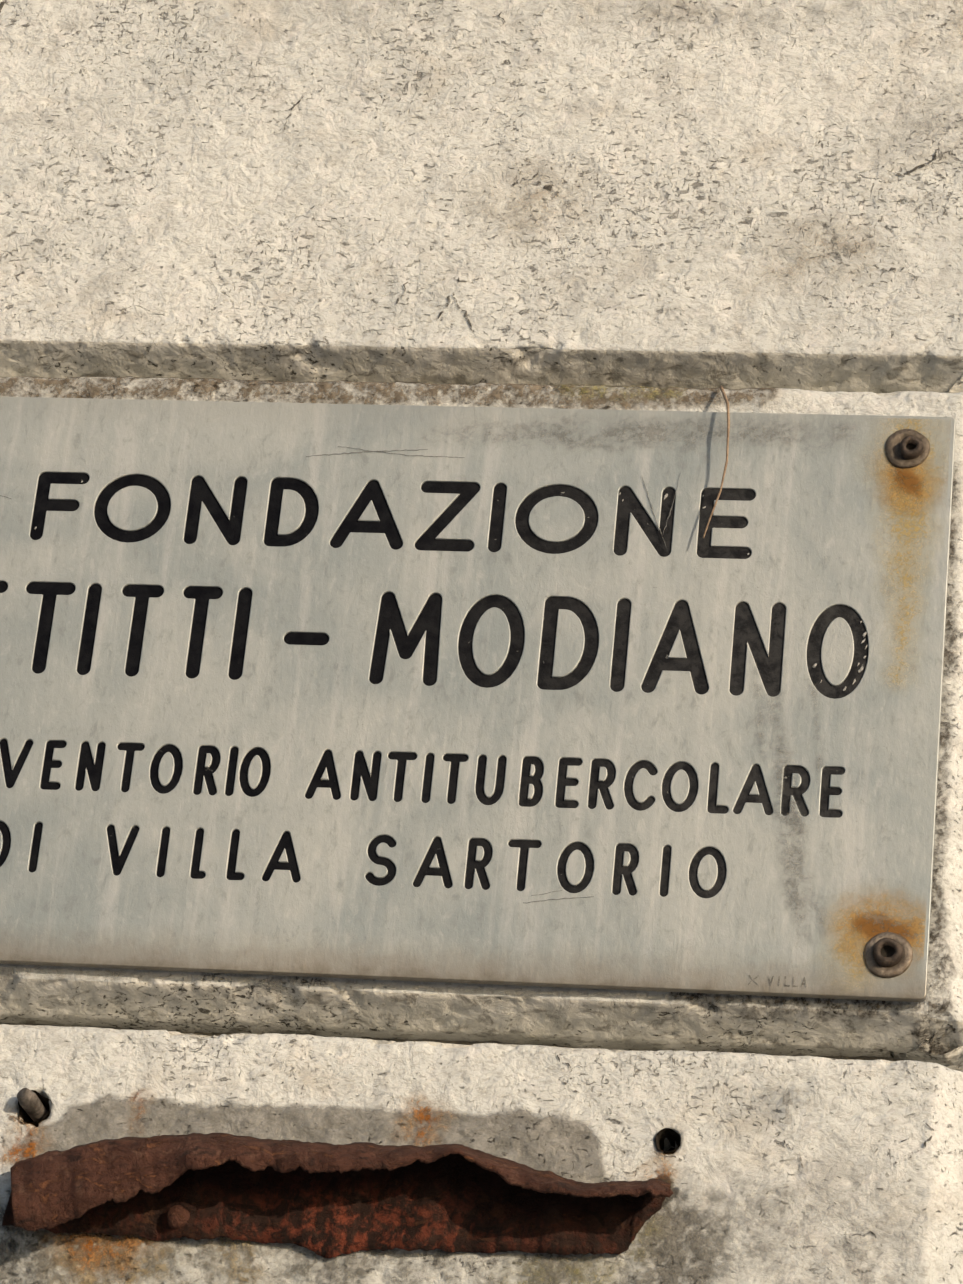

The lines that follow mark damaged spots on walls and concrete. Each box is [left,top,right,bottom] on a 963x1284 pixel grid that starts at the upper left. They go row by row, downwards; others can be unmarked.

corrosion [883,419,935,679]
corrosion [834,899,925,977]
corrosion [3,1122,40,1164]